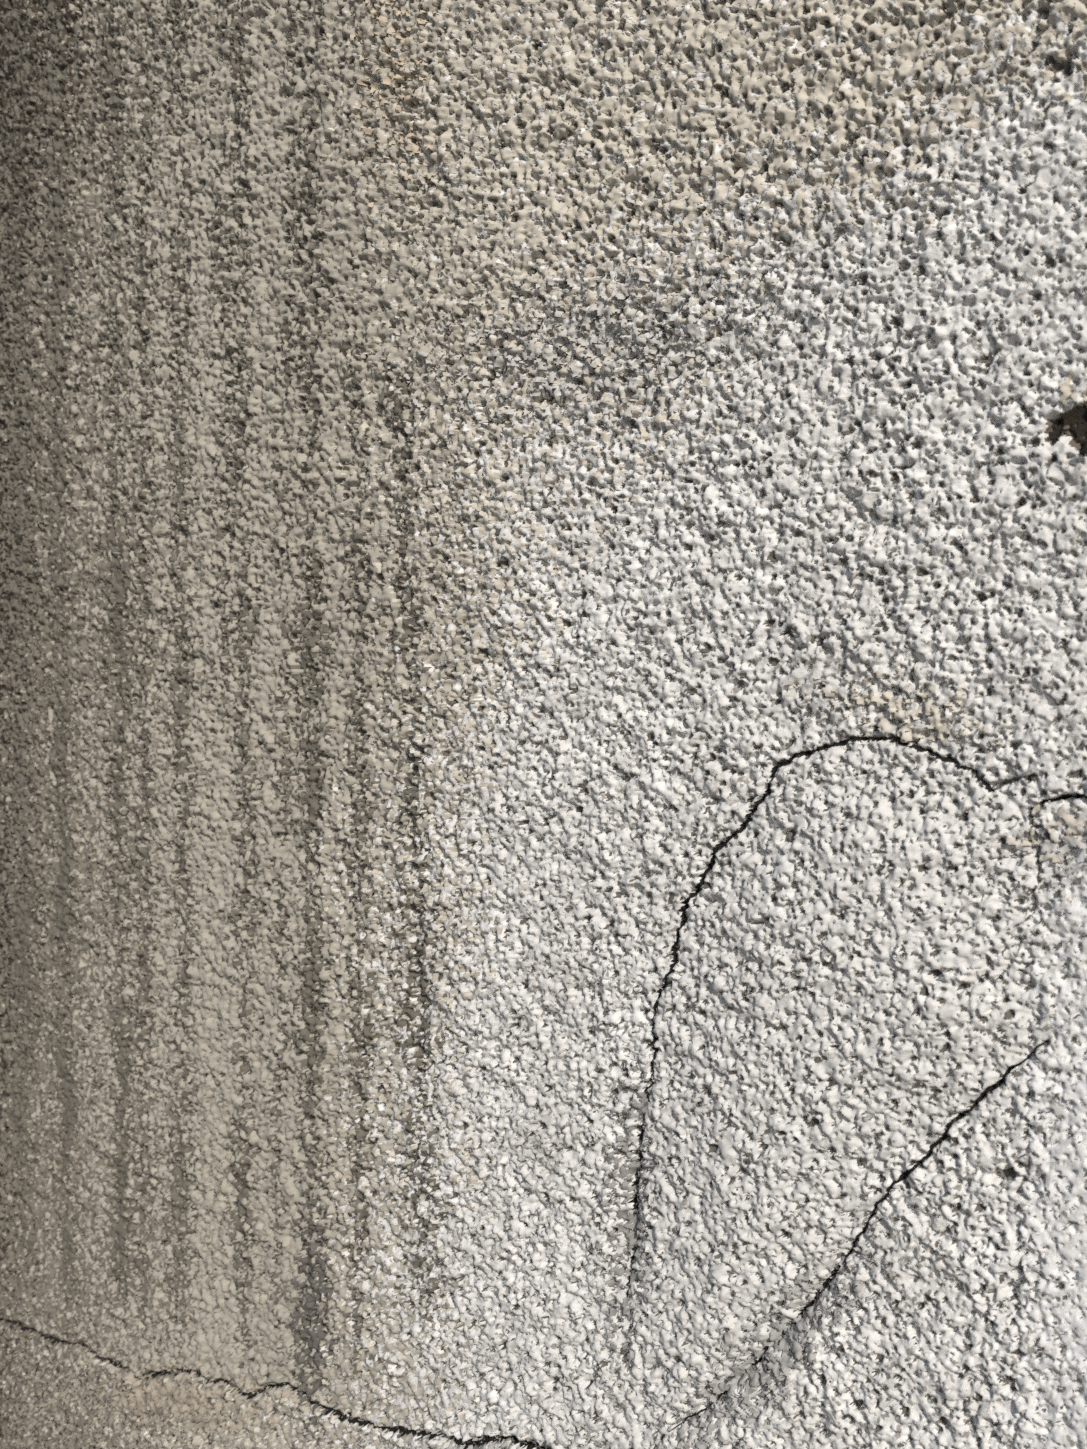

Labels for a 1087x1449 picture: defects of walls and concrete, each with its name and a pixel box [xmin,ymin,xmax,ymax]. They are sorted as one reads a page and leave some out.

water stain [995,100,1025,126]
water stain [783,241,821,317]
water stain [710,343,738,410]
crack [399,402,431,1302]
crack [626,736,1087,1297]
water stain [444,1077,458,1100]
crack [751,1040,1048,1366]
crack [0,1318,551,1449]
water stain [431,1429,465,1449]
crack [668,1390,728,1432]